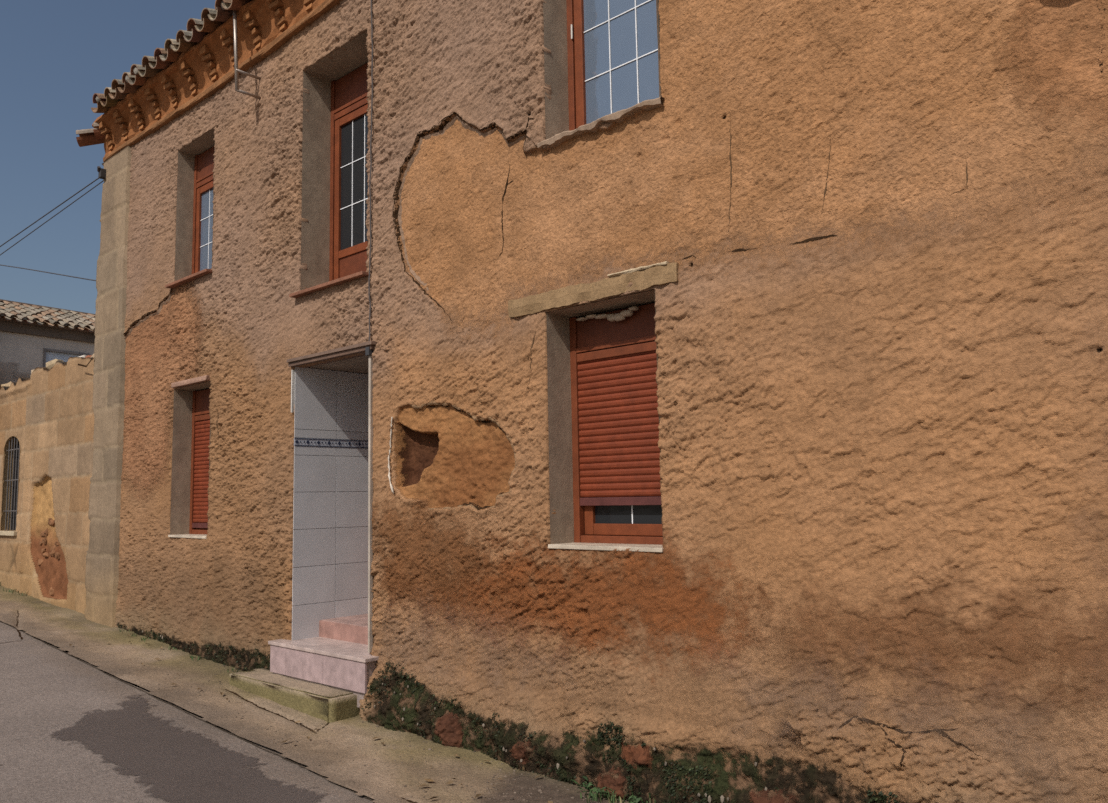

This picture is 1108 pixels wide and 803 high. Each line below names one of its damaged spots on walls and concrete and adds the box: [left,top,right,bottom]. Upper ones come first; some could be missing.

spalling [392,0,1108,339]
spalling [388,400,516,511]
spalling [30,476,68,599]
damp [372,499,748,658]
damp [785,592,1108,704]